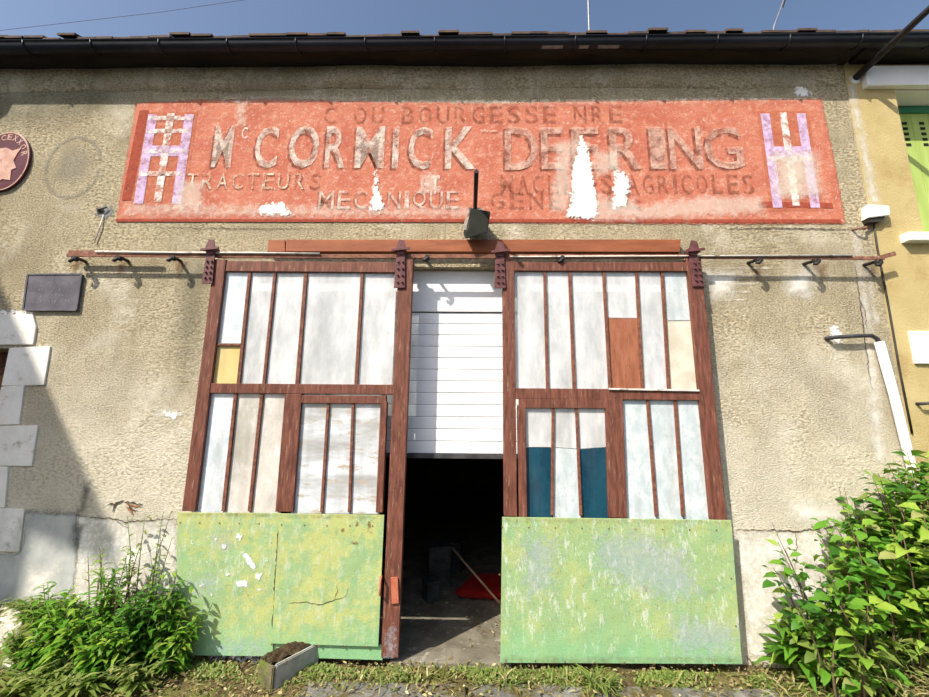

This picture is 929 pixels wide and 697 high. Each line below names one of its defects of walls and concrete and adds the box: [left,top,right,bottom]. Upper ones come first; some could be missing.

peeling [259,202,303,216]
peeling [368,170,384,213]
peeling [559,134,656,221]
crack [78,500,177,528]